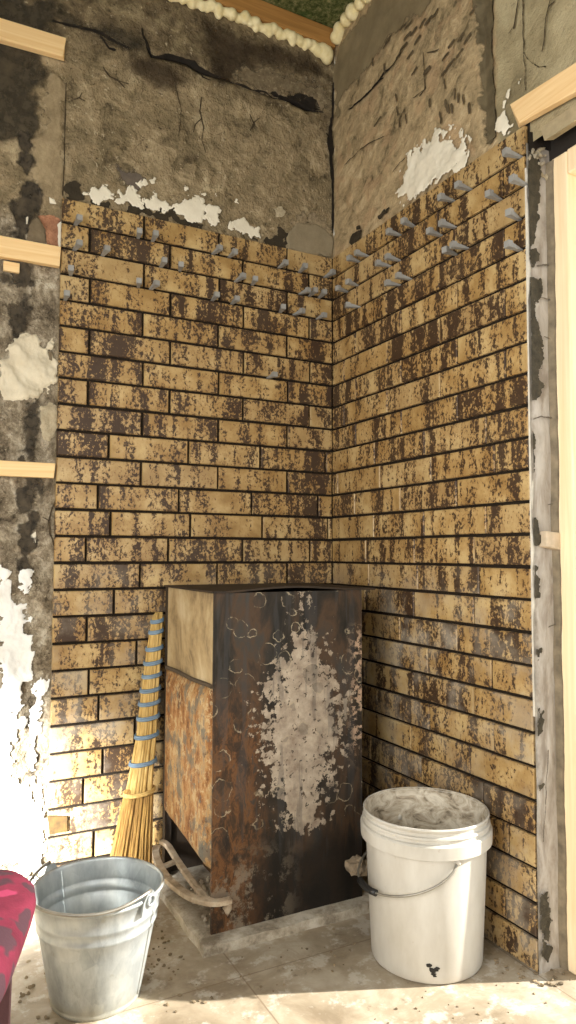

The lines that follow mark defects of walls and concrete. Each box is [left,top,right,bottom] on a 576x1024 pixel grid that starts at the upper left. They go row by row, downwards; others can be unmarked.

damp [8,130,43,240]
peeling [82,177,261,239]
crack [52,20,439,233]
flaking render [349,225,362,245]
peeling [378,124,472,220]
damp [0,260,35,338]
damp [17,400,41,462]
damp [15,477,45,572]
peeling [0,565,50,884]